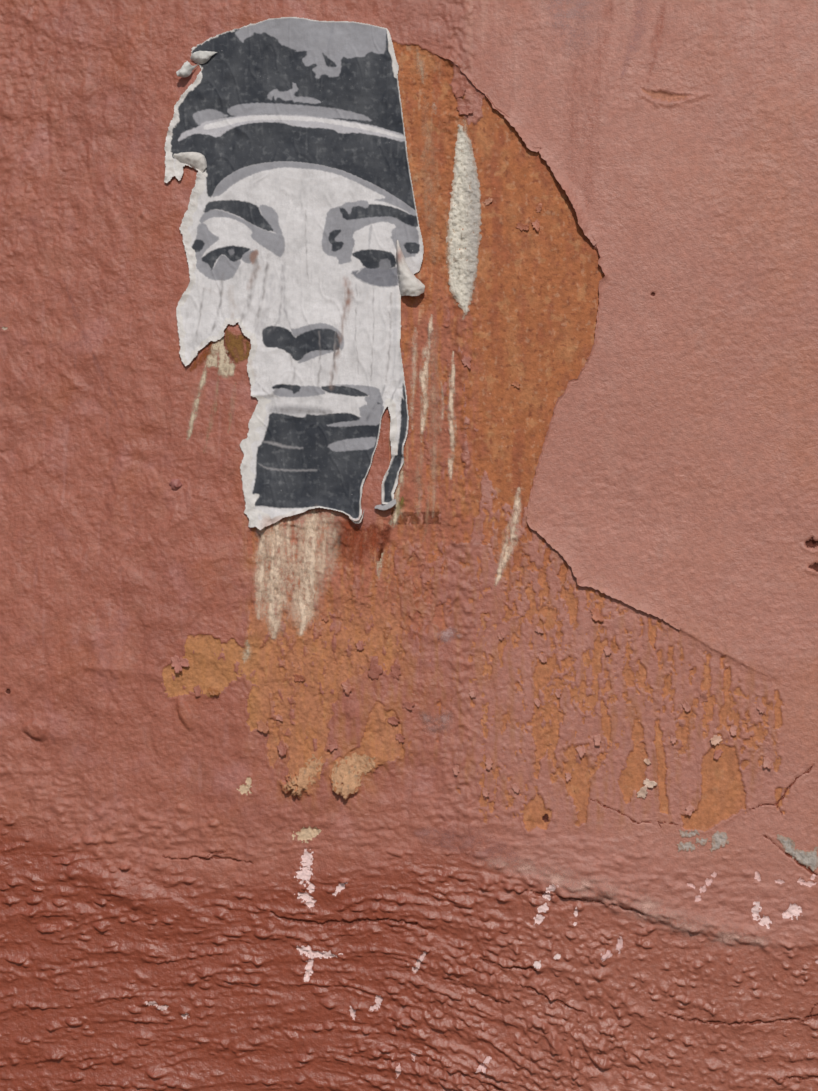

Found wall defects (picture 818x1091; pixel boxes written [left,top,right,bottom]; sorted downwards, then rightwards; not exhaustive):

peeling [161,41,784,852]
crack [590,799,678,828]
crack [162,851,254,864]
peeling [292,826,322,908]
crack [272,912,418,927]
peeling [296,945,343,982]
crack [665,1003,818,1025]